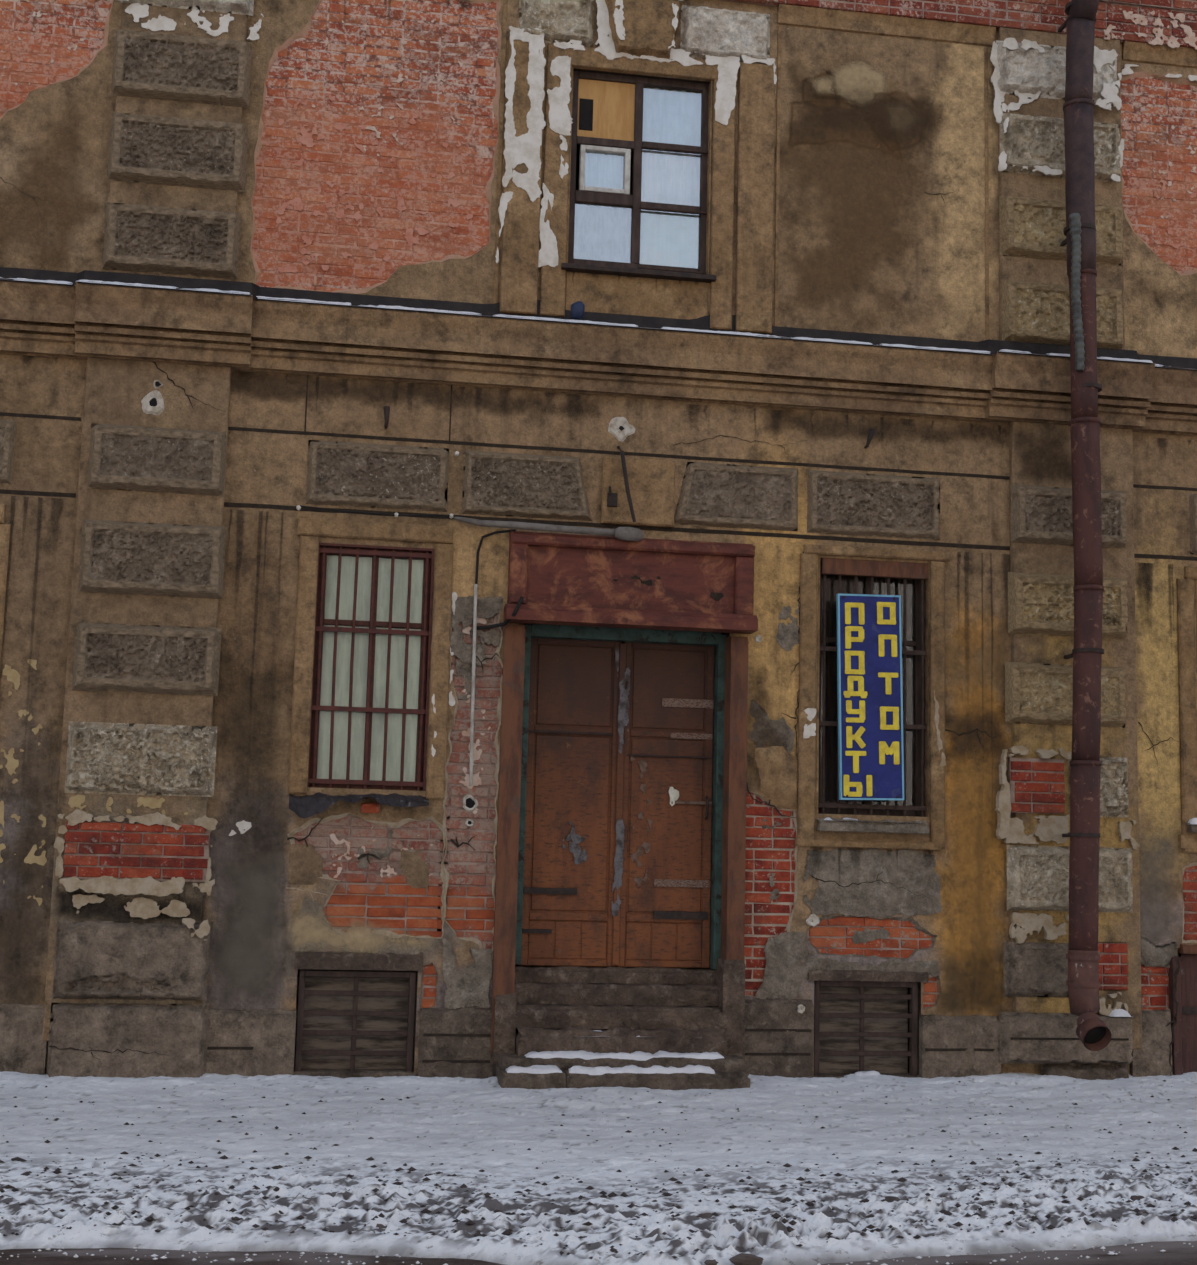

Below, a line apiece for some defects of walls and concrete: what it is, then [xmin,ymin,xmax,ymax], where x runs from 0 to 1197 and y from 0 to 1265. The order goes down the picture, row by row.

flaking render [0,0,234,120]
flaking render [250,0,777,294]
water stain [780,62,931,302]
peeling [990,38,1045,133]
peeling [998,151,1062,175]
flaking render [1093,46,1197,276]
flaking render [0,795,252,941]
flaking render [287,592,503,1009]
spalling [744,791,942,1014]
flaking render [995,745,1072,845]
spalling [1009,912,1069,944]
flaking render [1098,942,1171,1016]